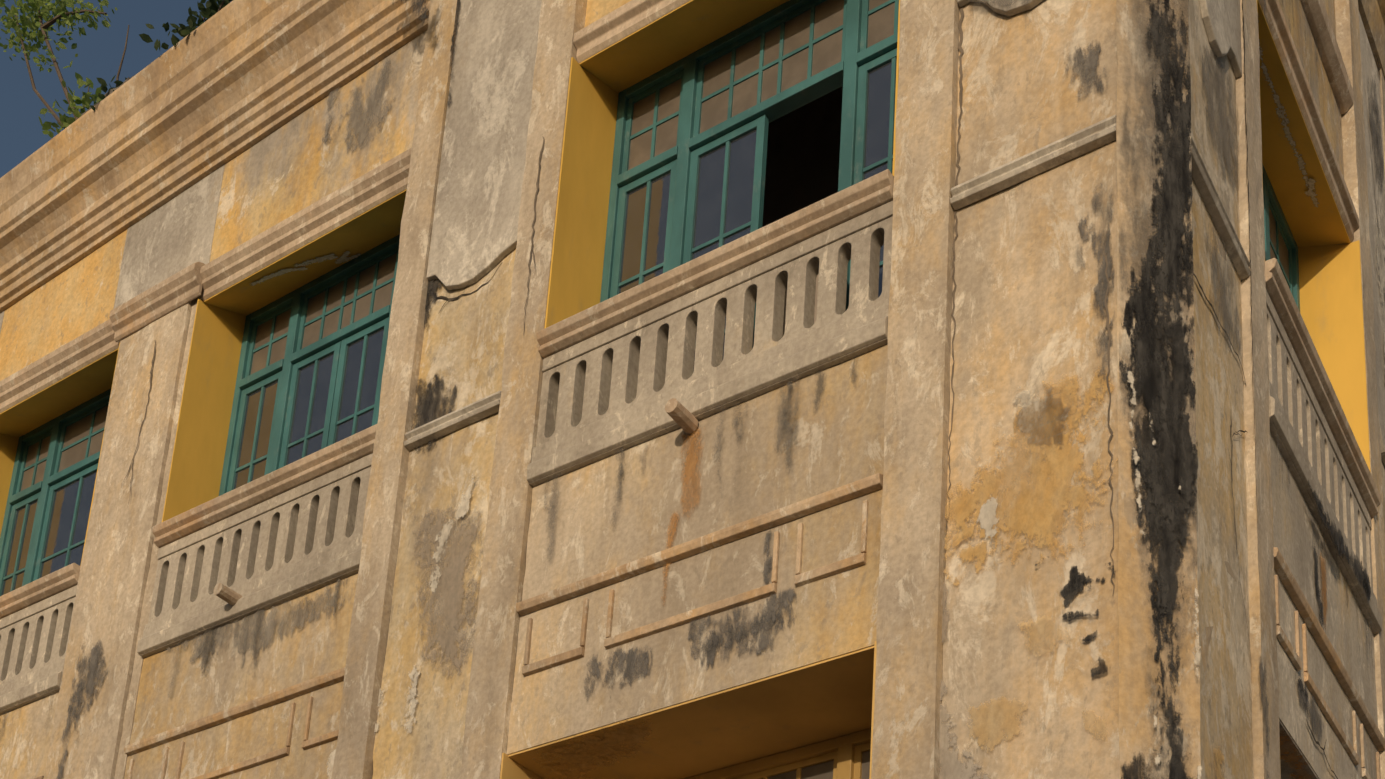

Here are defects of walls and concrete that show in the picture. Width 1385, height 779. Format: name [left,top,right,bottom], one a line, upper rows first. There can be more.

damp [1066,43,1104,93]
damp [1367,58,1384,191]
damp [1078,0,1240,779]
damp [688,532,796,667]
peeling [942,371,1142,642]
damp [1060,562,1115,642]
flaking render [1193,588,1201,676]
damp [1314,547,1323,626]
damp [1308,480,1371,600]
flaking render [939,680,990,779]
flaking render [1280,734,1311,779]
crack [1306,720,1338,779]